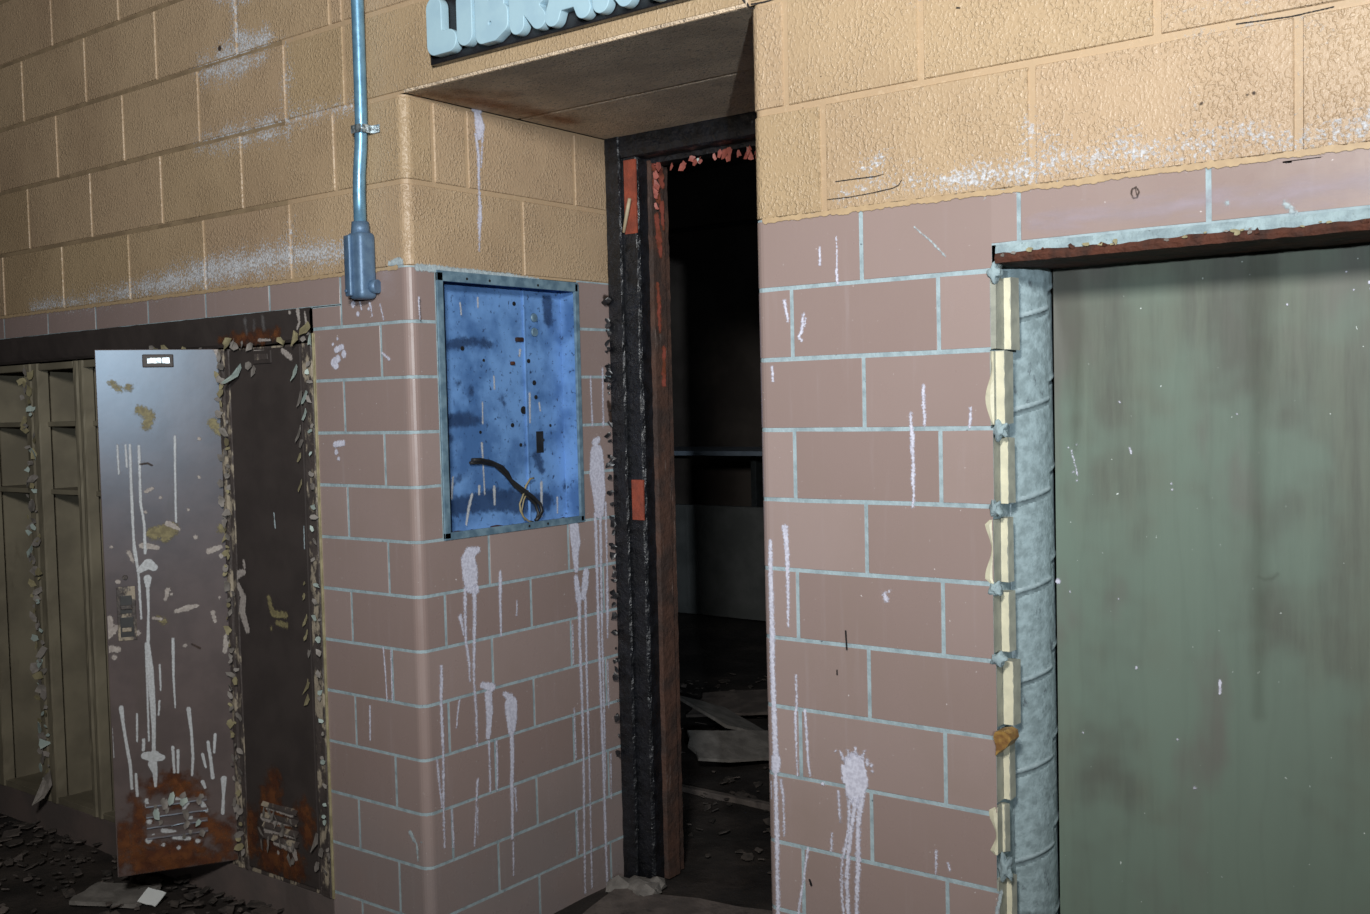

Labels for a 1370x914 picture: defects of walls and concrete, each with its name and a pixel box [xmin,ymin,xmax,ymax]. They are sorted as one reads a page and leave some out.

efflorescence [194,0,354,156]
peeling [653,145,756,210]
efflorescence [838,109,1370,199]
efflorescence [30,226,344,314]
rust [117,771,315,882]